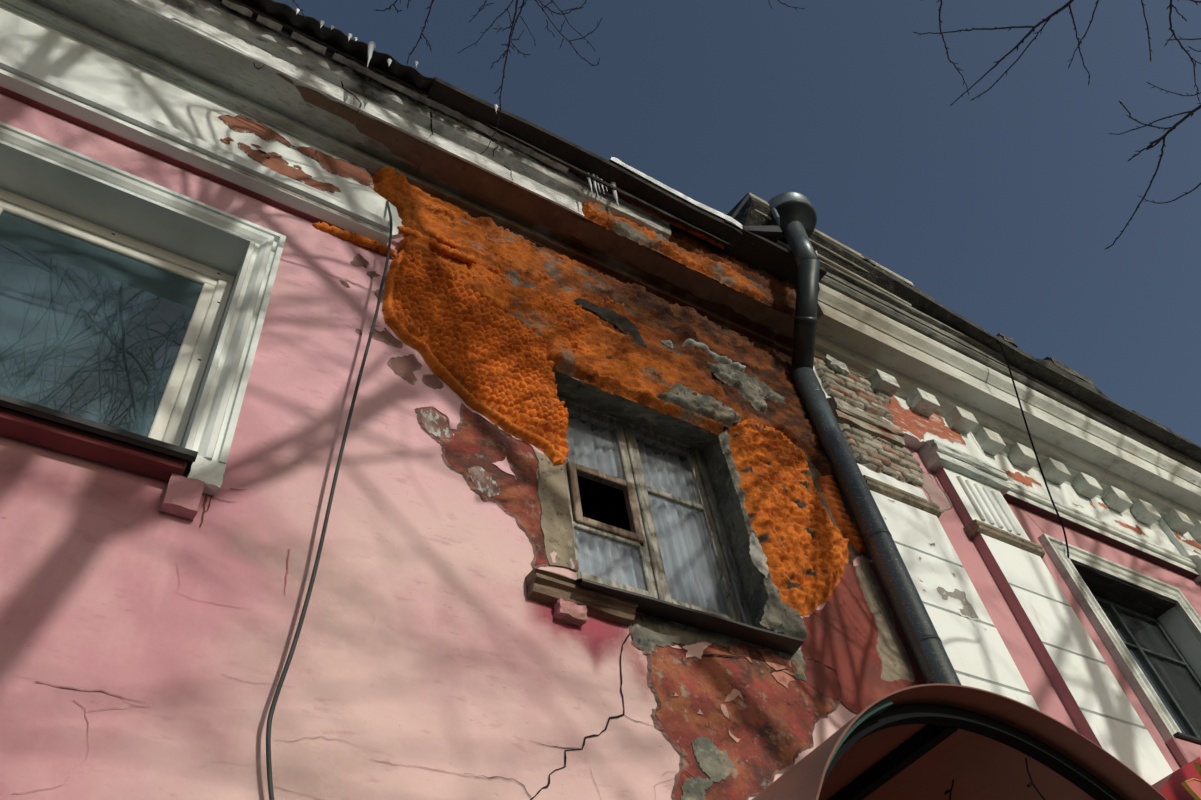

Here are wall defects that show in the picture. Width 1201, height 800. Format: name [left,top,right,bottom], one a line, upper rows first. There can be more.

peeling [218,115,375,193]
peeling [275,73,794,338]
flaking render [355,326,444,389]
peeling [414,403,579,572]
spalling [573,298,647,348]
flaking render [661,339,786,413]
flaking render [813,357,967,513]
peeling [629,383,927,800]
peeling [918,570,981,620]
crack [273,634,655,800]